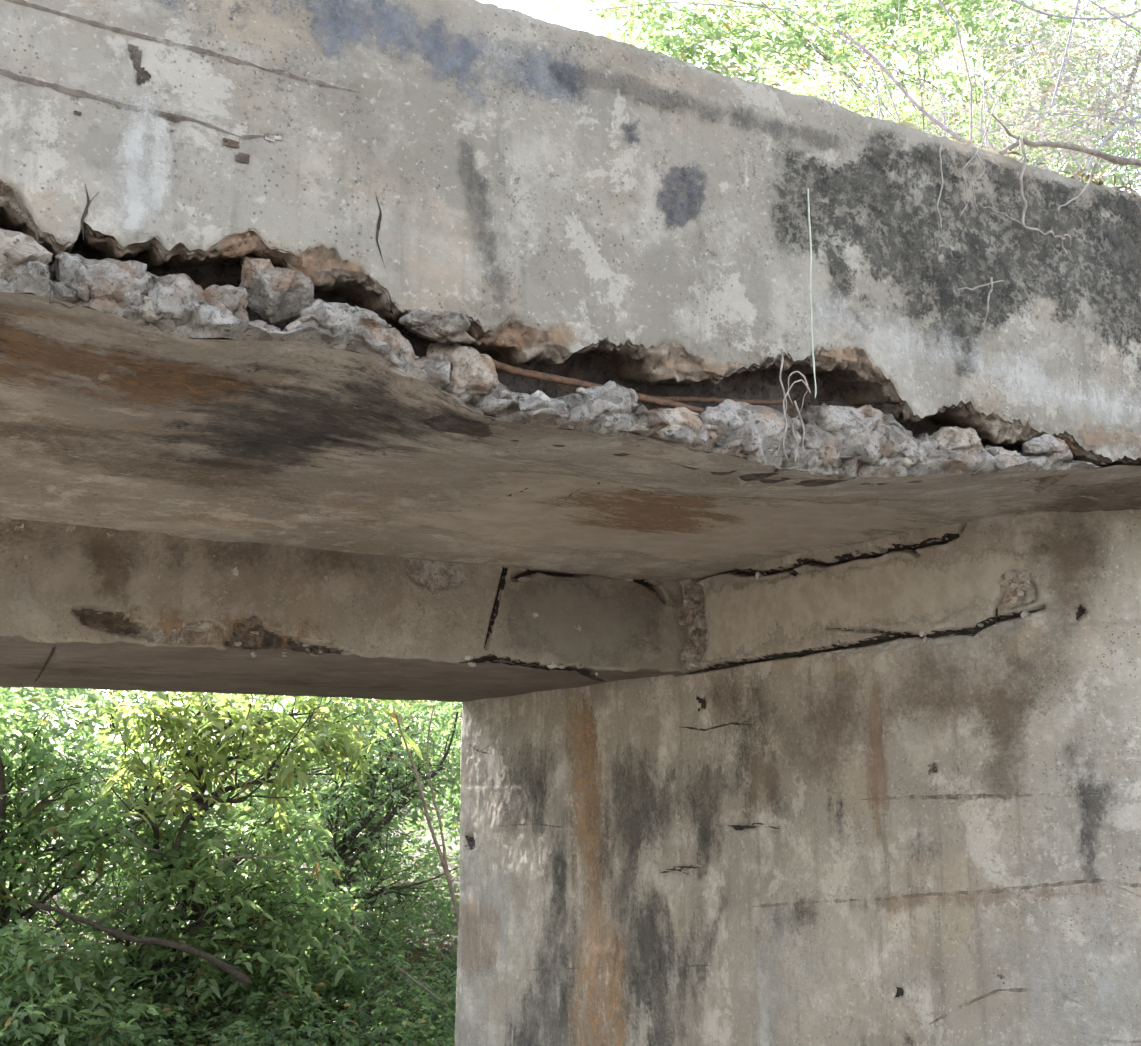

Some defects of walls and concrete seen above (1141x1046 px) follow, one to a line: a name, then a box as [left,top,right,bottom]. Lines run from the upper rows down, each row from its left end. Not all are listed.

damp [772,134,1141,422]
spalling [0,179,1141,493]
rust [666,359,741,374]
spalling [72,608,142,636]
spalling [223,616,343,658]
crack [465,568,606,682]
crack [623,578,656,592]
crack [690,529,964,588]
crack [686,608,1044,674]
damp [687,698,780,878]
damp [488,747,576,1046]
damp [599,750,721,1046]